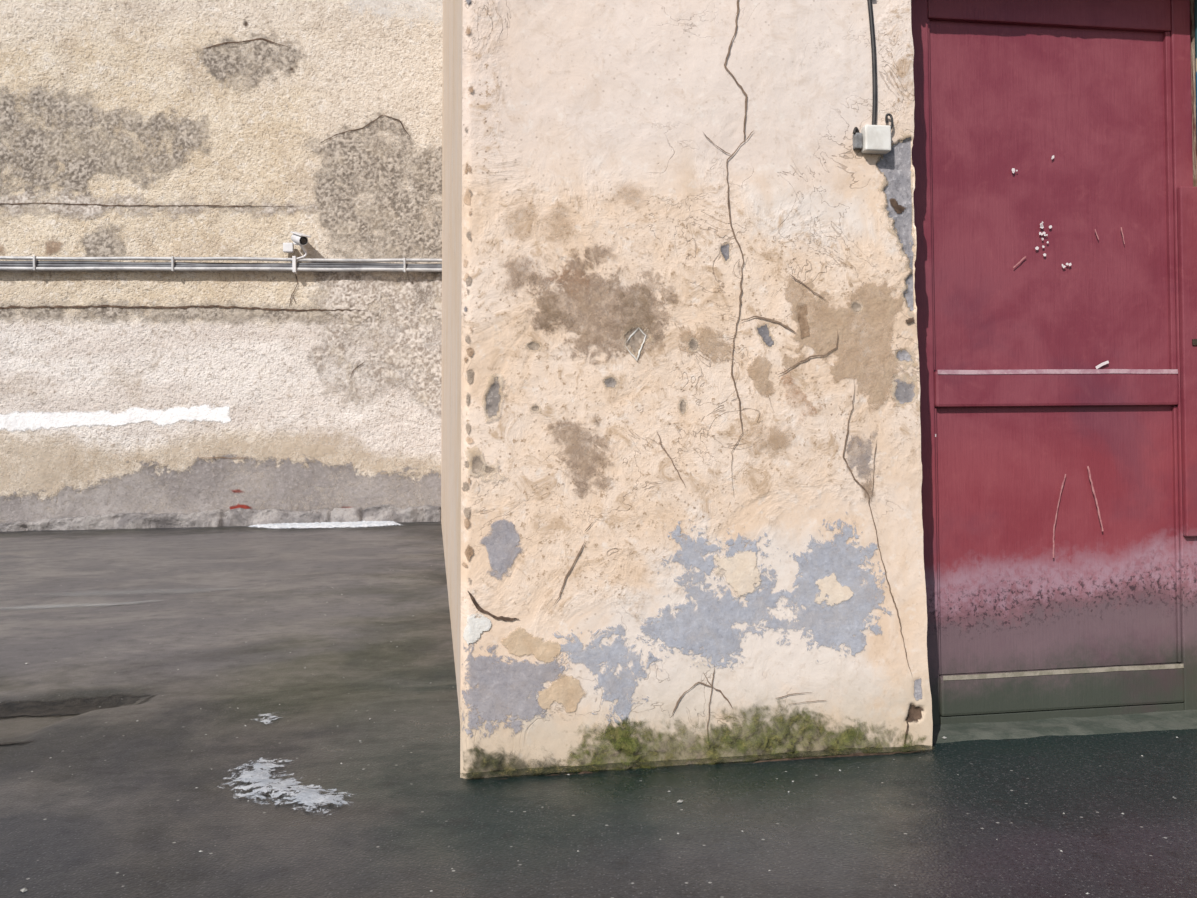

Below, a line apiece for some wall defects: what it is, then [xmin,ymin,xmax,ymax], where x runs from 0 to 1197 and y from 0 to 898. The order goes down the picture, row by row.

crack [704,0,796,496]
spalling [876,134,915,324]
spalling [755,322,776,348]
spalling [890,350,918,406]
crack [657,432,685,485]
crack [843,375,912,674]
peeling [713,551,761,597]
peeling [815,573,854,606]
peeling [501,624,662,725]
crack [672,664,732,737]
crack [776,692,827,704]
crack [743,714,924,764]